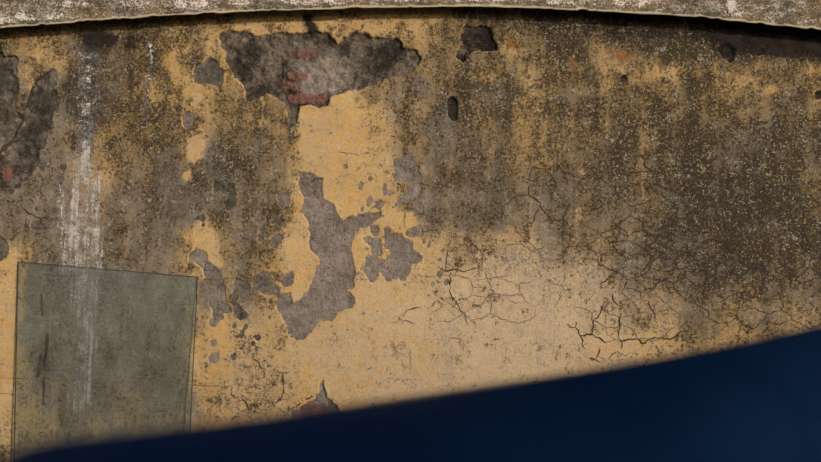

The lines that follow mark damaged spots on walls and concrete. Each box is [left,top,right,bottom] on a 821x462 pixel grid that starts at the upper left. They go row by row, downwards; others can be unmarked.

spalling [456,26,497,62]
water stain [456,0,821,64]
spalling [0,54,62,227]
spalling [194,31,421,124]
spalling [447,97,458,121]
spalling [0,237,9,261]
water stain [58,27,153,413]
peeling [187,153,430,364]
peeling [431,258,452,287]
crack [396,142,821,363]
crack [0,358,314,420]
spalling [292,380,337,413]